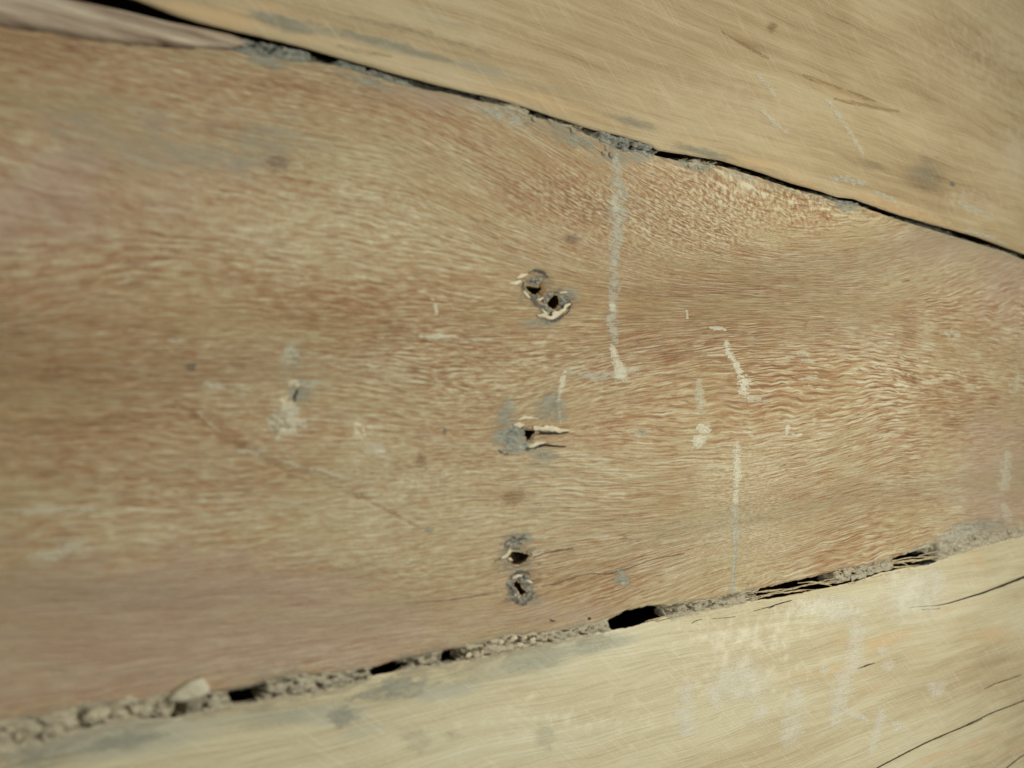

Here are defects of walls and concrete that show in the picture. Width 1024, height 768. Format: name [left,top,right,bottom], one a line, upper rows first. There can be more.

crack [909,576,1024,610]
crack [877,675,1024,768]